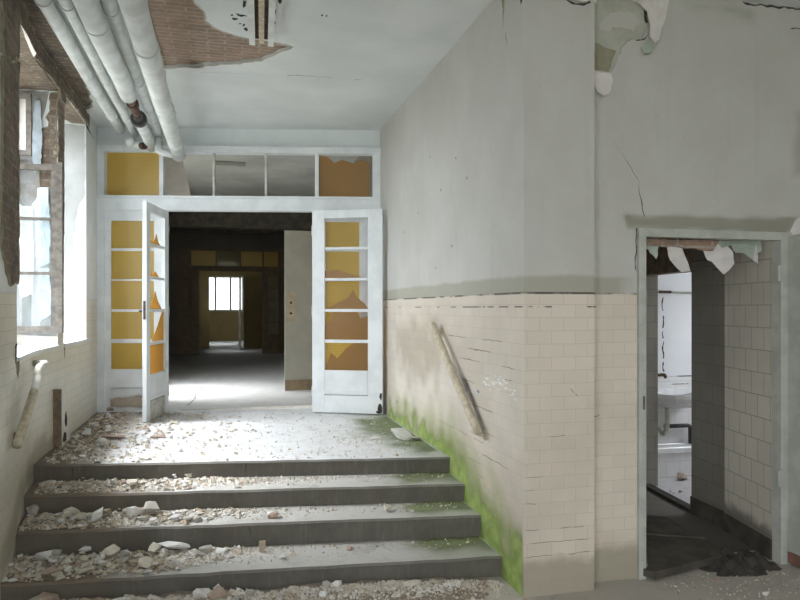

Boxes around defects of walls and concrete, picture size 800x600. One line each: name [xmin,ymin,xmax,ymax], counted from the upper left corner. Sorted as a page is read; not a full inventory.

spalling [148,0,293,69]
peeling [567,0,669,96]
crack [743,2,800,29]
spalling [0,0,94,378]
crack [613,141,645,270]
peeling [646,238,762,275]